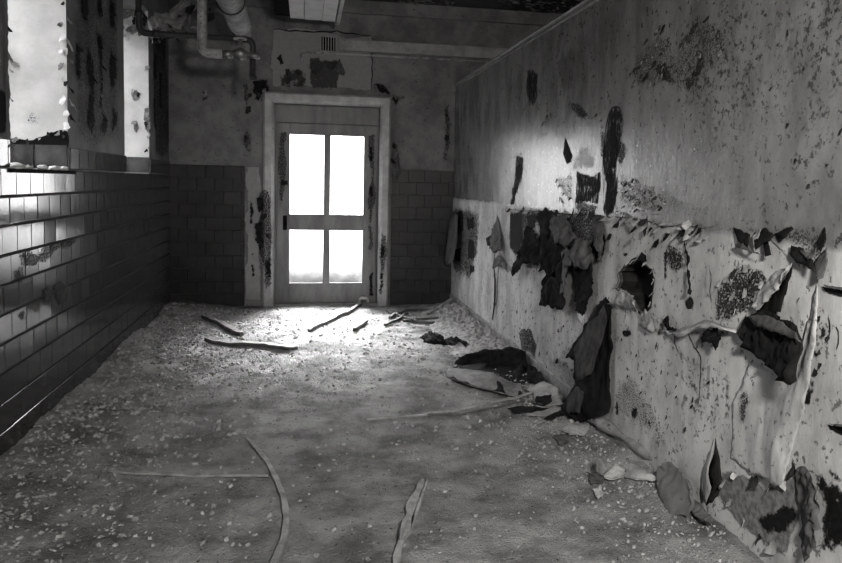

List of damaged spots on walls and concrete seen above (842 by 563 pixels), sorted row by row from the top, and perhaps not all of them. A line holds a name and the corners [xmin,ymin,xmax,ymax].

peeling [0,0,148,158]
peeling [153,38,169,157]
flaking render [243,28,405,114]
leakage [575,106,625,217]
flaking render [244,166,263,301]
flaking render [509,212,537,256]
flaking render [566,214,605,263]
spalling [612,252,655,314]
mould [709,261,767,320]
spalling [719,461,799,555]